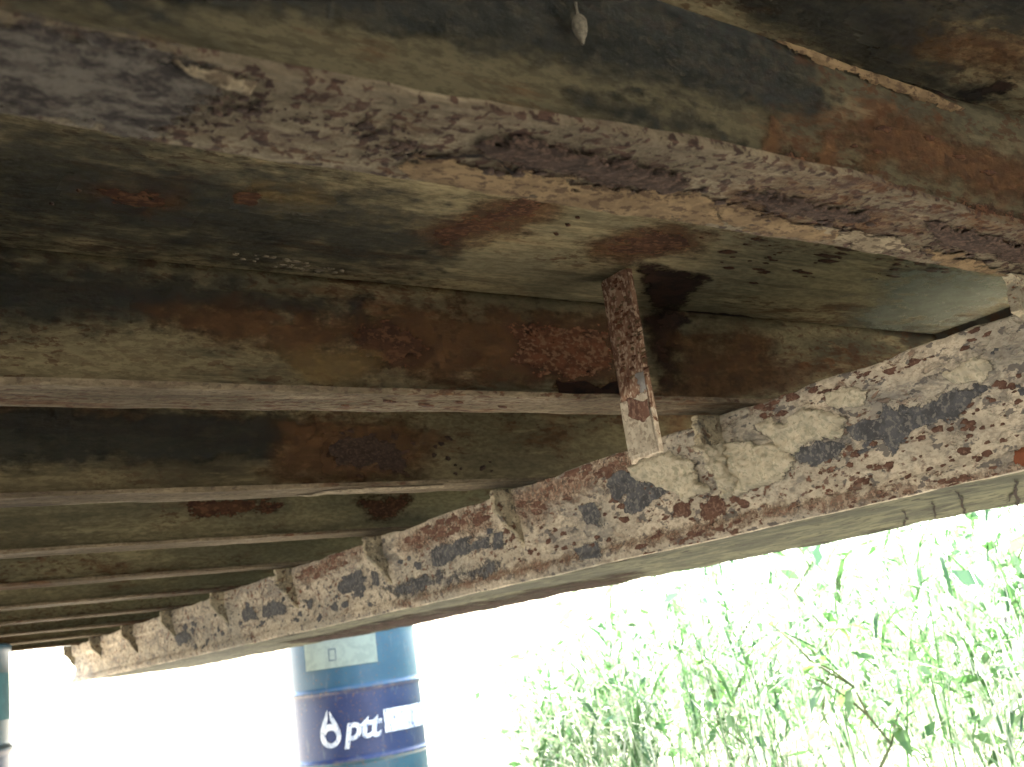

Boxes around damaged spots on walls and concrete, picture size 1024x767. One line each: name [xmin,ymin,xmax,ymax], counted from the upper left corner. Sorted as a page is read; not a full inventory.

rust [412,198,580,256]
rust [346,223,730,389]
rust [470,135,877,284]
peeling [395,153,1009,277]
rust [876,219,1024,280]
rust [186,498,285,519]
rust [282,374,1024,644]
peeling [171,528,504,651]